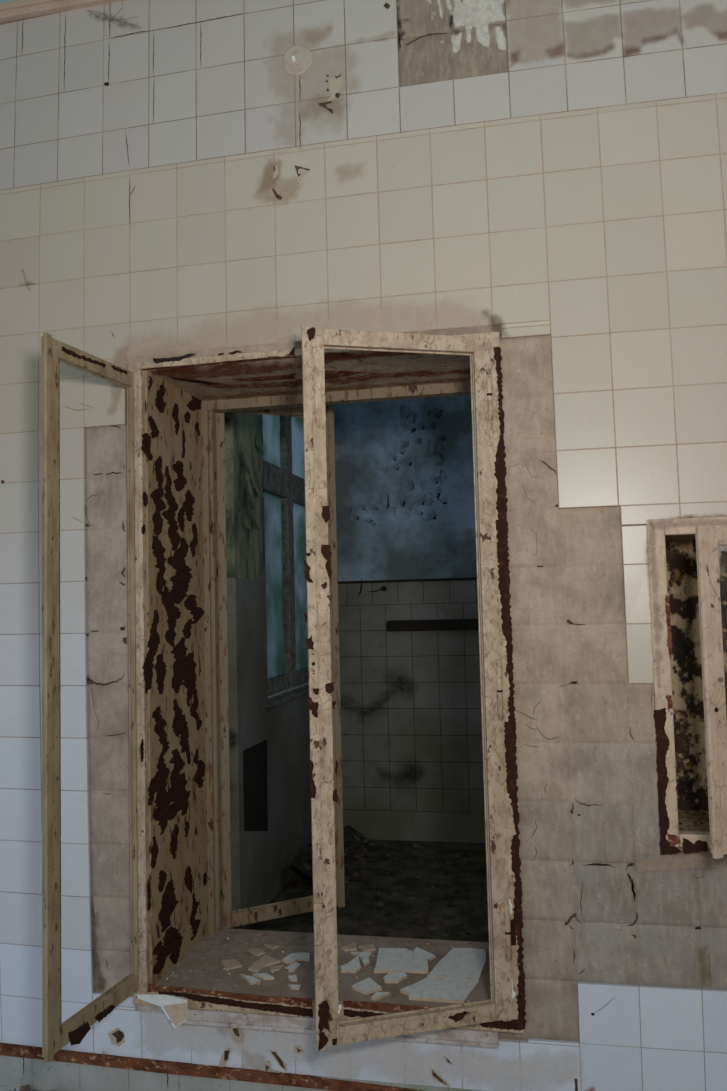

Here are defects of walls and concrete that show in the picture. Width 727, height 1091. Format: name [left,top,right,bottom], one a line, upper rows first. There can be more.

peeling [397,0,509,87]
peeling [86,425,144,993]
peeling [141,376,207,974]
rust [479,347,526,1031]
peeling [500,335,727,1042]
rust [448,1011,470,1022]